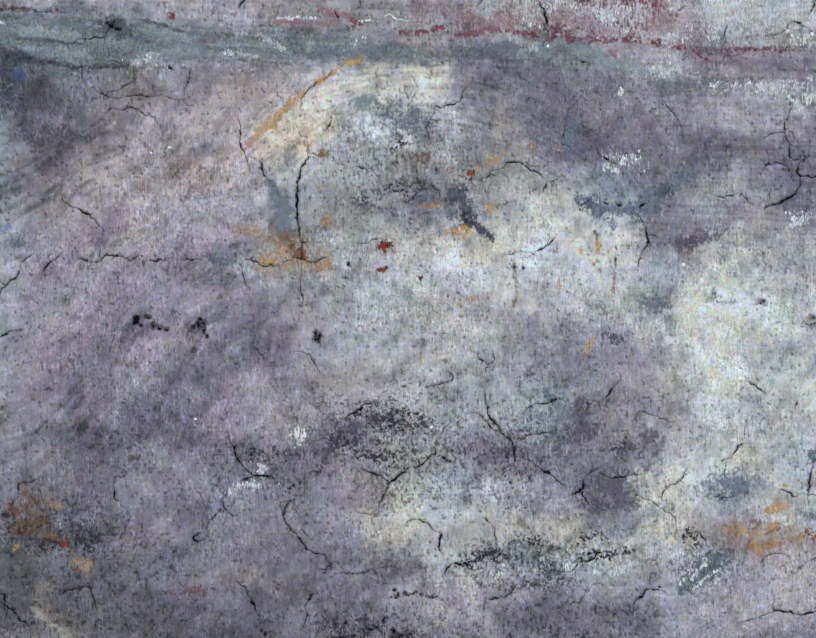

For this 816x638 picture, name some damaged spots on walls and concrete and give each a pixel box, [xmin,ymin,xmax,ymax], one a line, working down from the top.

rust [315,55,364,84]
rust [245,91,305,147]
crack [710,99,816,209]
crack [61,196,195,263]
rust [242,224,332,277]
crack [240,109,336,308]
rust [376,239,393,255]
crack [357,349,637,514]
crack [193,433,276,545]
rust [2,485,109,572]
crack [407,519,466,574]
rust [729,502,795,553]